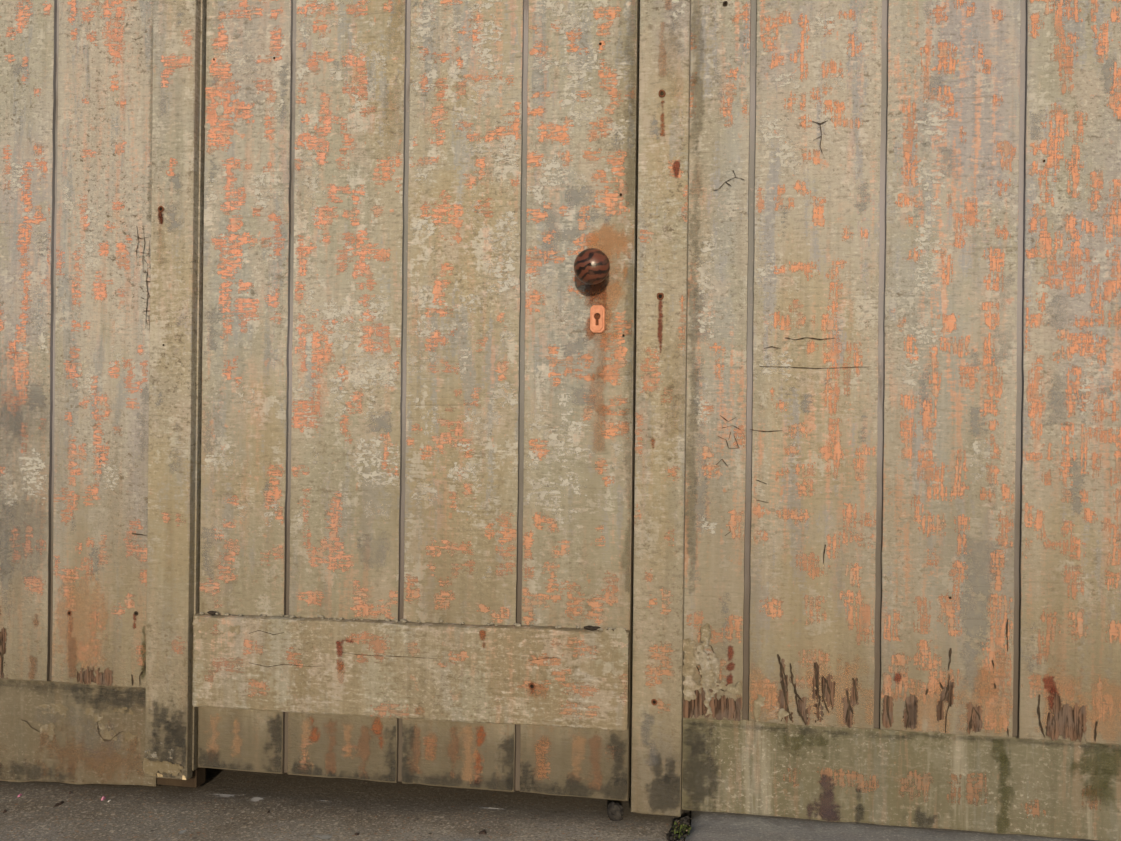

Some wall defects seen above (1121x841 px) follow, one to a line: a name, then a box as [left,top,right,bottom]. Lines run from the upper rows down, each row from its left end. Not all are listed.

peeling [67,0,136,108]
peeling [720,0,863,227]
corrosion [591,224,627,256]
peeling [0,141,161,526]
corrosion [585,269,627,338]
peeling [678,236,726,426]
peeling [693,258,876,541]
peeling [0,523,109,615]
peeling [171,495,270,698]
peeling [645,606,789,723]
damp [807,775,839,822]
damp [994,741,1011,833]